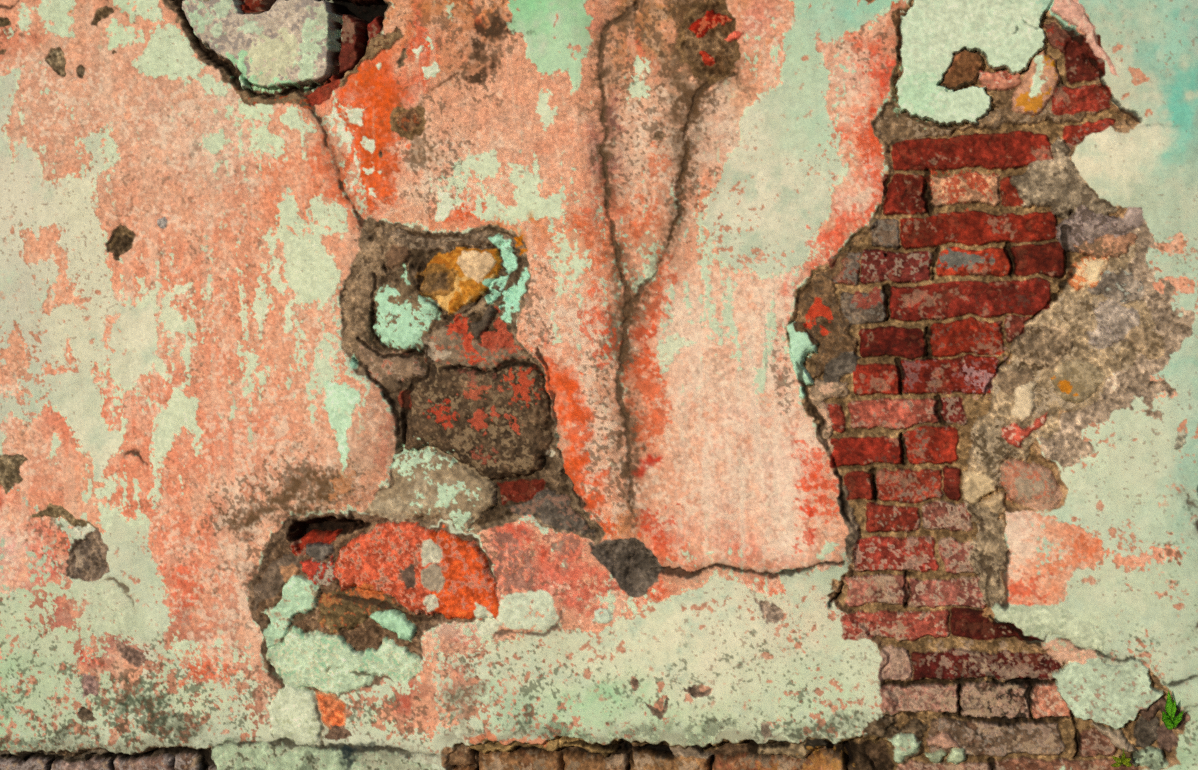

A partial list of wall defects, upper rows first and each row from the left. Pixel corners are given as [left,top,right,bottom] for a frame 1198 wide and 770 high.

spalling [0,747,217,770]
peeling [0,0,786,745]
crack [597,0,714,519]
crack [660,560,847,581]
spalling [441,0,1198,770]
crack [1091,650,1198,713]